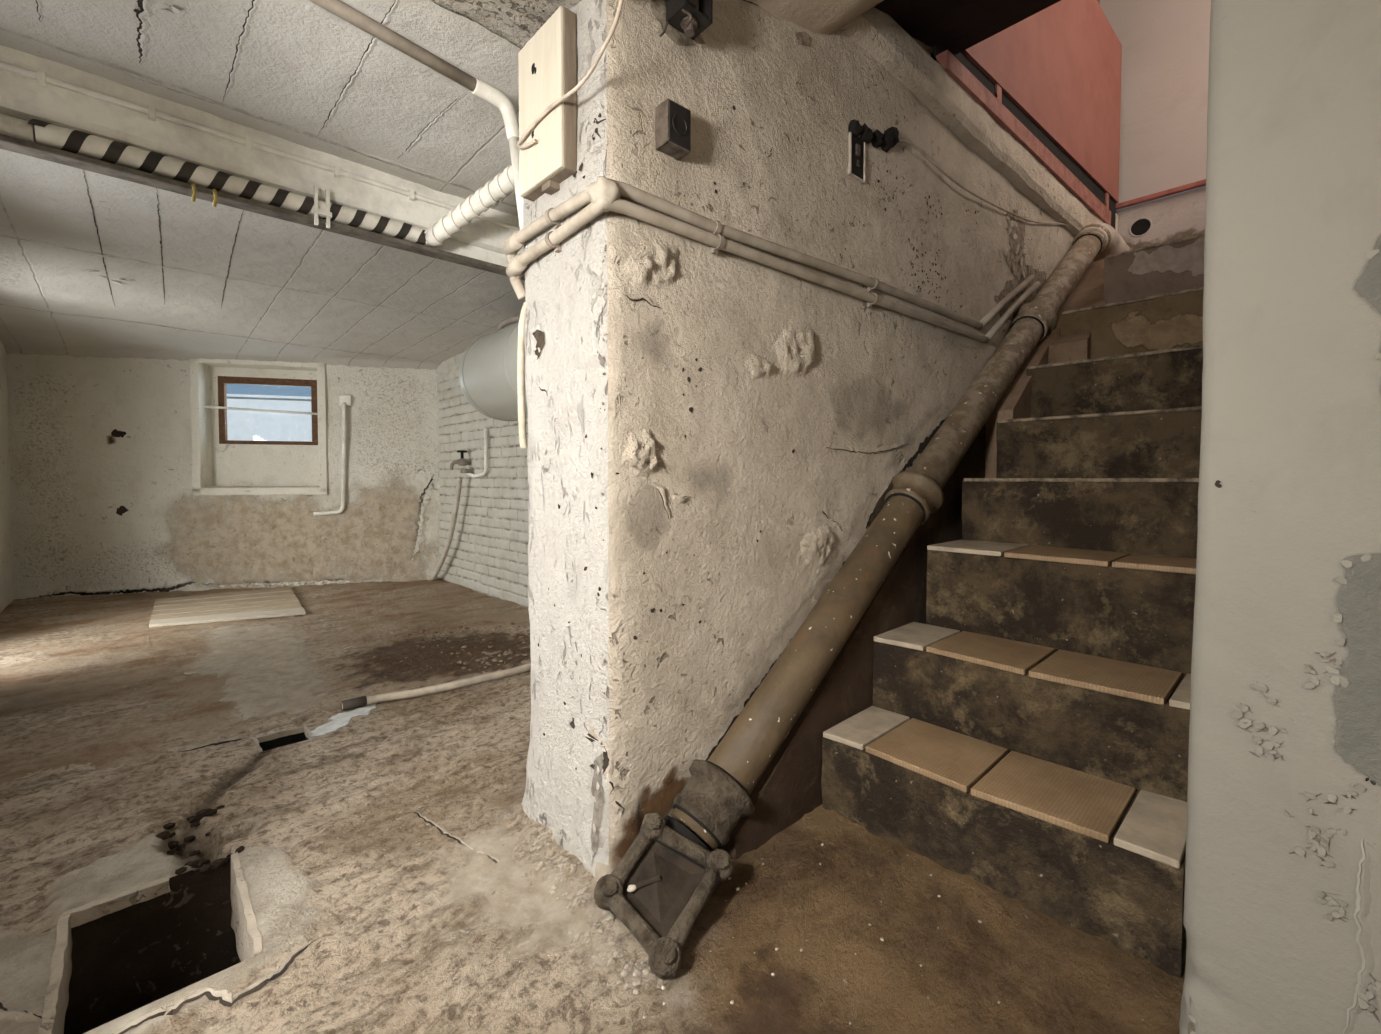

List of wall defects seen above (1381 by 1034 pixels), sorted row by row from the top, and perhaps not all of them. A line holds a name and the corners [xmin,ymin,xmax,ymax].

crack [124,0,467,182]
peeling [1355,237,1381,313]
water stain [169,485,435,589]
water stain [338,631,531,688]
crack [177,734,250,752]
water stain [311,703,377,737]
peeling [1232,682,1287,761]
peeling [1283,553,1381,868]
crack [1343,839,1375,1034]
crack [112,940,315,1034]